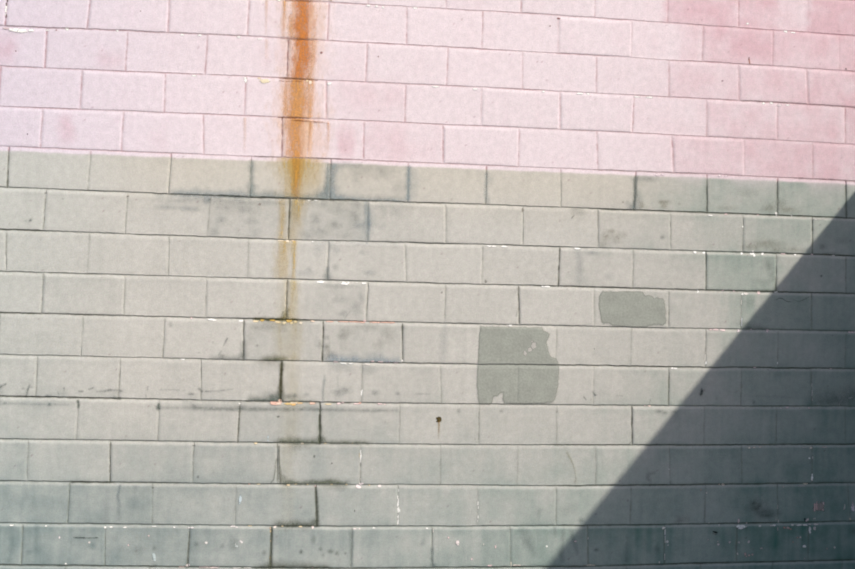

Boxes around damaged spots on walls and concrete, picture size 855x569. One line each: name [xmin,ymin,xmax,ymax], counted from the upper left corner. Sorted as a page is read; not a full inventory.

rust [282,0,317,209]